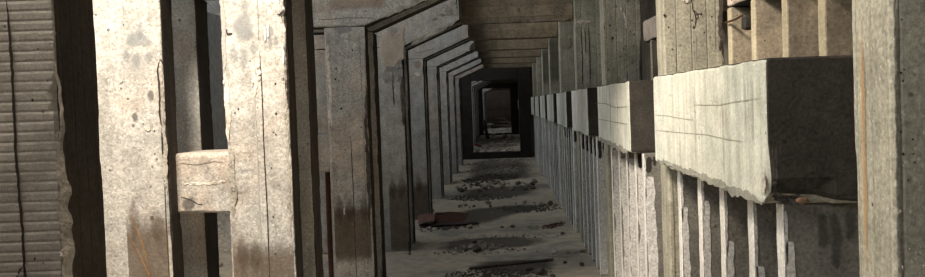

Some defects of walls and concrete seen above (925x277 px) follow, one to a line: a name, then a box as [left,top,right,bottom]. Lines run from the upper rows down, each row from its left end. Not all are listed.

crack [6,0,27,277]
spalling [47,34,75,277]
crack [164,180,203,231]
crack [157,59,221,167]
crack [691,0,716,49]
spalling [893,0,925,277]